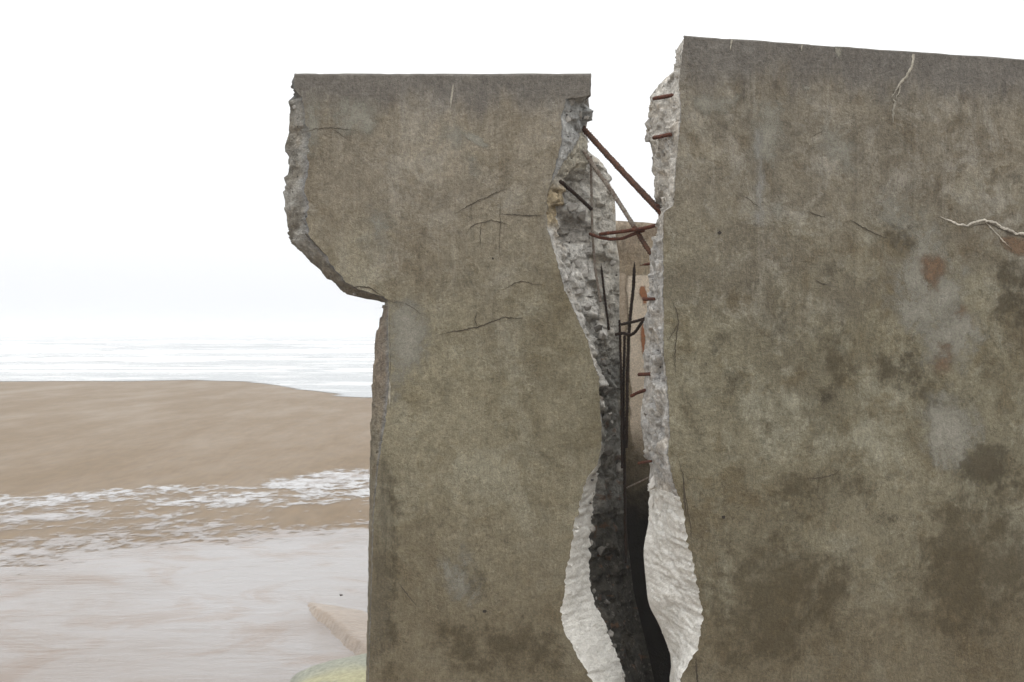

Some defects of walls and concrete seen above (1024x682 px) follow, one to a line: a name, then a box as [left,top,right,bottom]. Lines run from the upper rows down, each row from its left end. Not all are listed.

crack [891,54,915,123]
crack [456,188,543,290]
crack [938,216,1024,250]
spalling [283,74,389,682]
crack [438,313,519,336]
spalling [546,35,704,682]